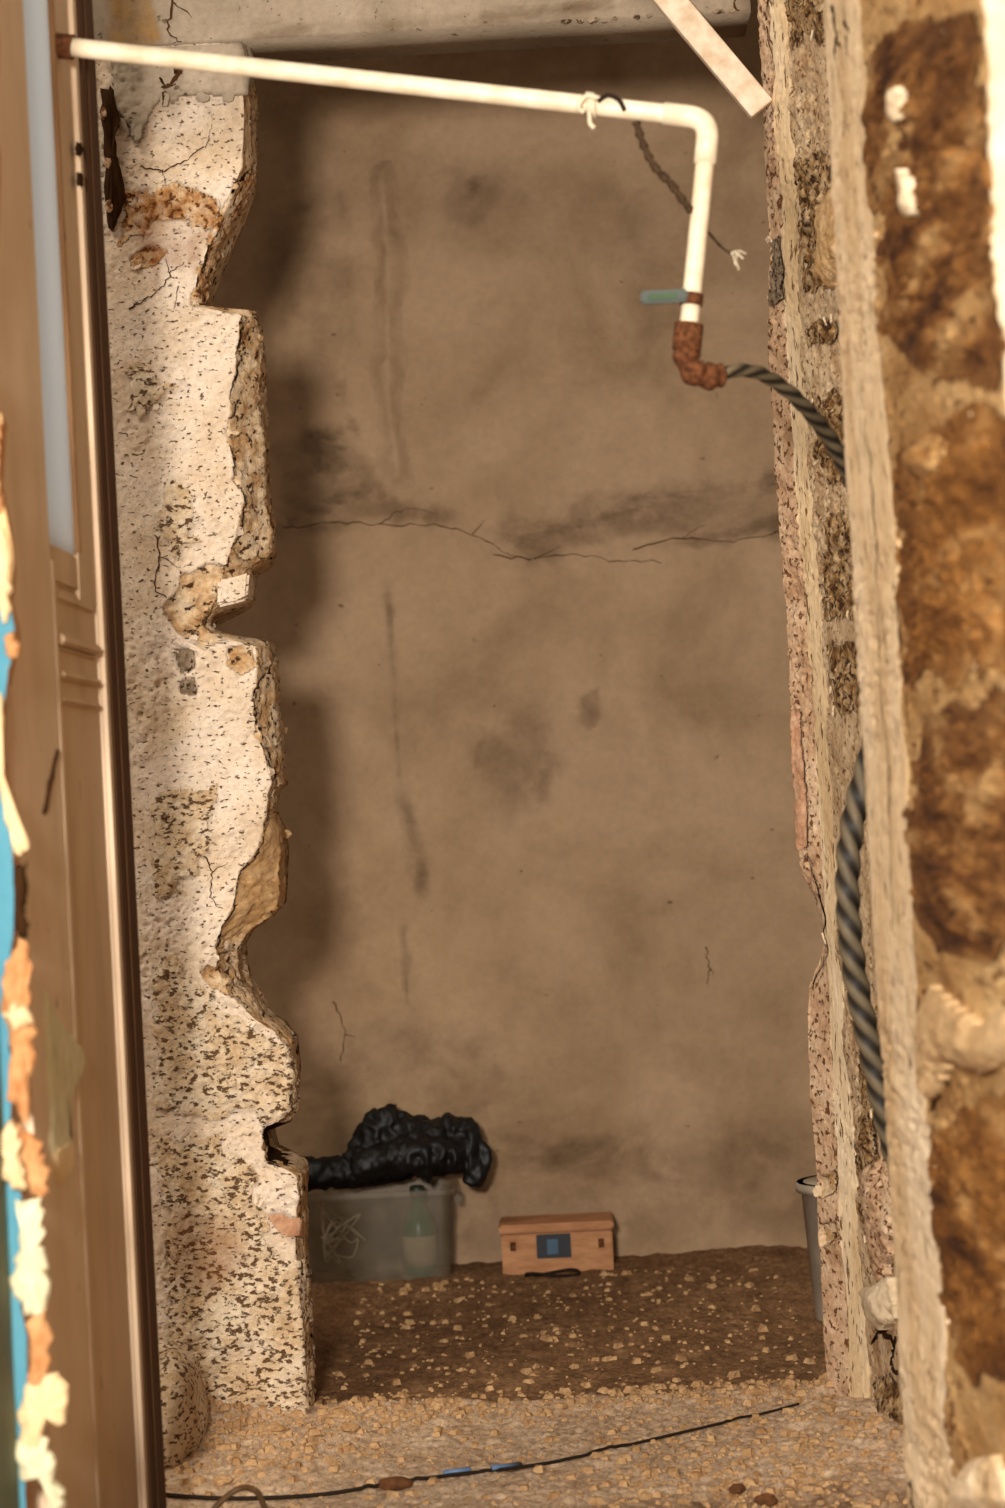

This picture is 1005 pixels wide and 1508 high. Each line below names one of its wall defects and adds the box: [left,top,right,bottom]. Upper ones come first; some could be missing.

crack [166,0,191,42]
peeling [161,42,255,58]
peeling [100,61,256,307]
flaking render [123,361,184,421]
spalling [154,315,289,791]
crack [283,508,779,563]
flaking render [149,783,218,900]
peeling [0,693,84,1508]
flaking render [149,811,316,1411]